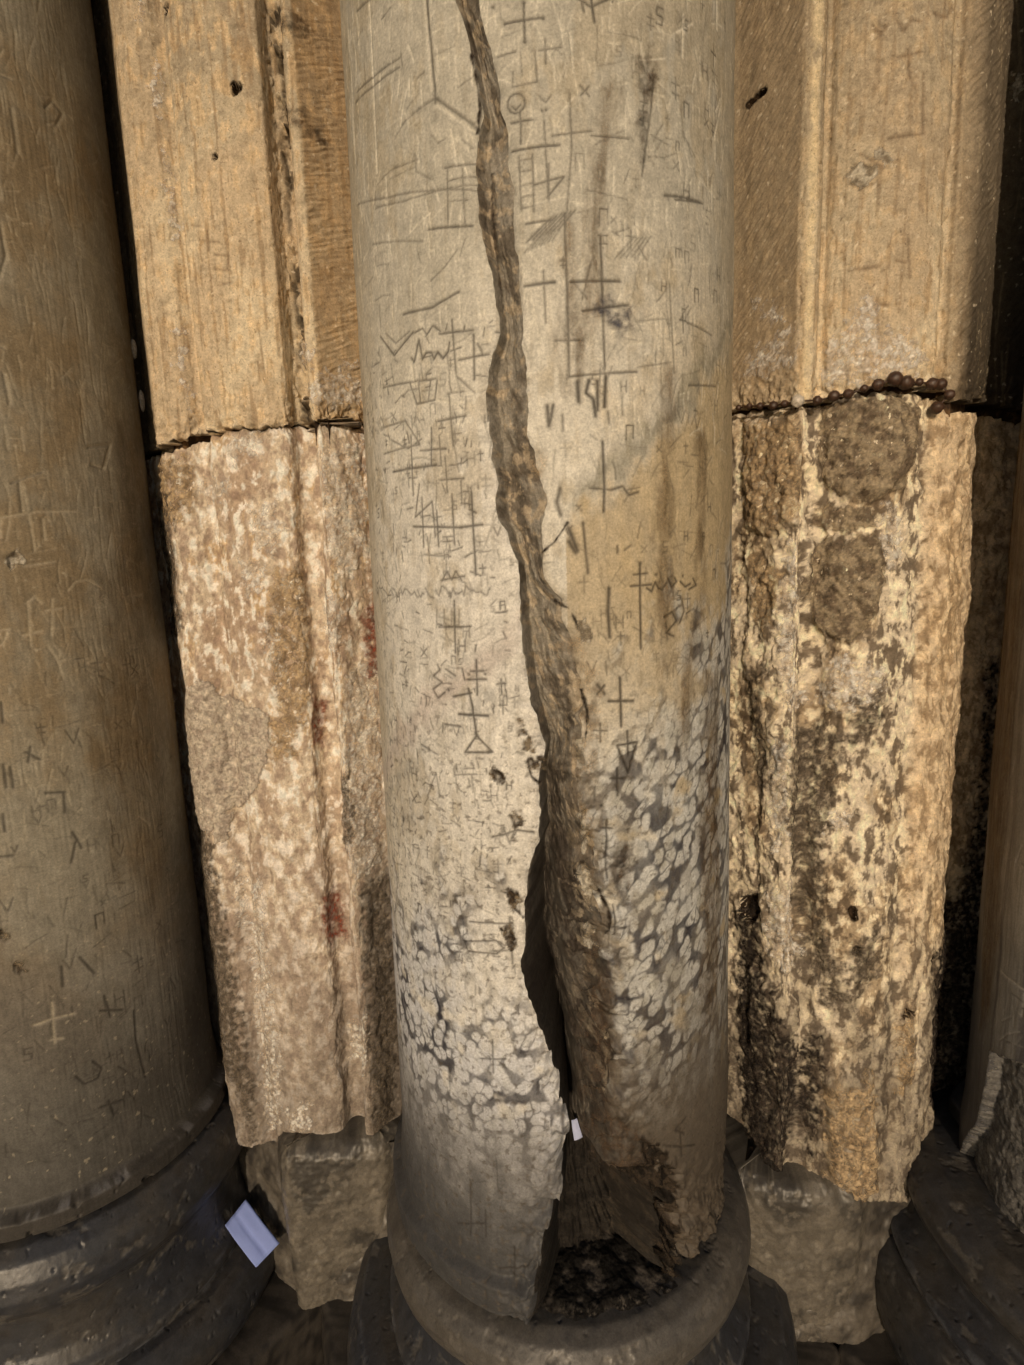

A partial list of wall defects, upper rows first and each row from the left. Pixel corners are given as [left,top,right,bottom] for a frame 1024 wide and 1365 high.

crack [145,407,364,461]
crack [732,386,1022,425]
crack [456,0,675,1314]
peeling [577,863,597,904]
peeling [582,922,595,949]
leakage [745,666,767,787]
leakage [784,694,885,1009]
leakage [929,433,1024,1110]
leakage [733,898,827,1172]
spalling [542,1138,682,1320]
spalling [960,1050,1024,1234]